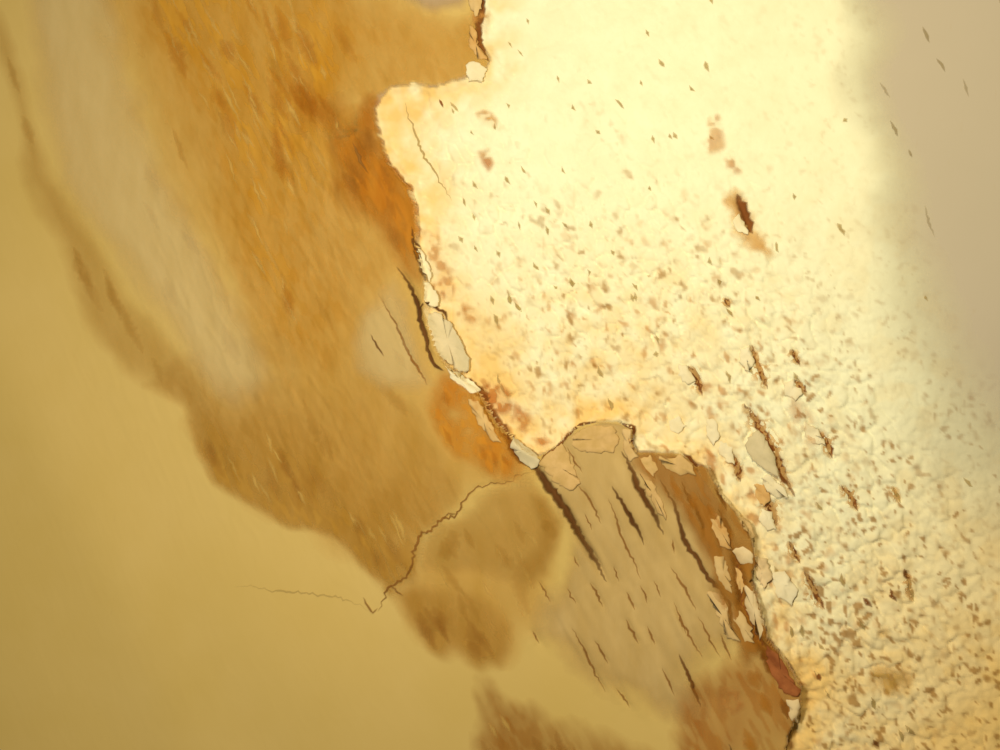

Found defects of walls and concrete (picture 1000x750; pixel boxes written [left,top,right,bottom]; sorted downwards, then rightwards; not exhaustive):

leakage [39,0,254,385]
leakage [127,0,496,583]
crack [365,482,501,613]
leakage [428,560,506,661]
flaking render [375,0,1000,750]